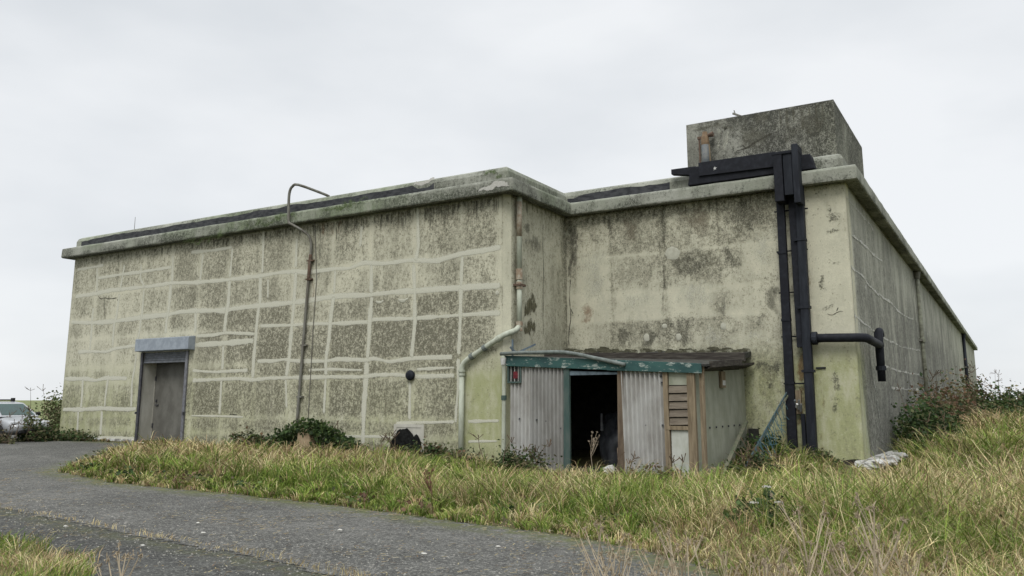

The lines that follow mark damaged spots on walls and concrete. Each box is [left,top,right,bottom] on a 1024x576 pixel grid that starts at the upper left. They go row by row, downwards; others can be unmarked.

spalling [479,181,509,191]
damp [524,295,537,334]